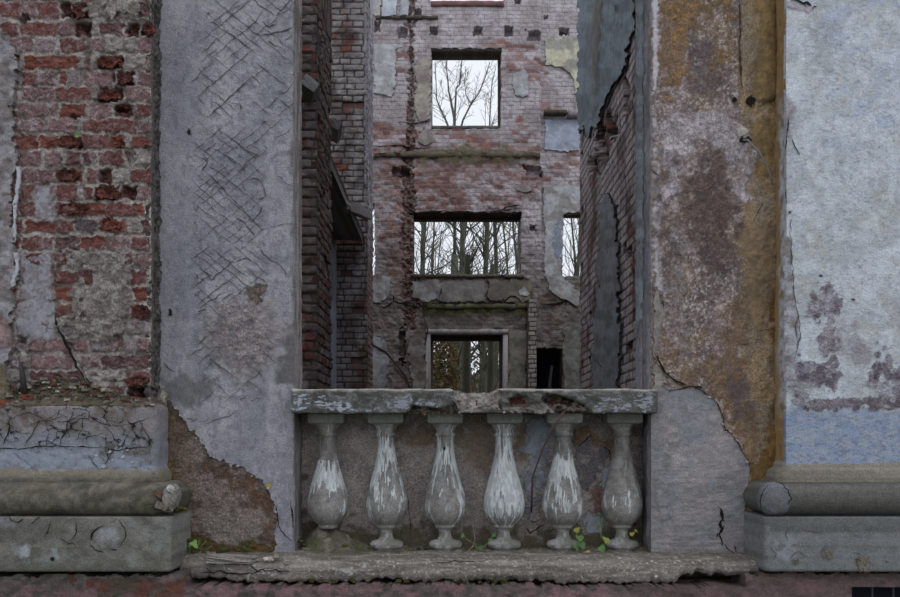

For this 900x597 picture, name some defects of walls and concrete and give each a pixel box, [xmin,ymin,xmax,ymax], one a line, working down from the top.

spalling [97,56,134,103]
spalling [55,135,83,148]
spalling [56,168,82,182]
peeling [0,33,44,397]
spalling [57,184,120,216]
spalling [98,217,122,231]
crack [187,0,294,424]
peeling [292,0,750,554]
spalling [130,304,150,319]
crack [0,312,153,471]
spalling [154,400,292,565]
crack [717,507,737,553]